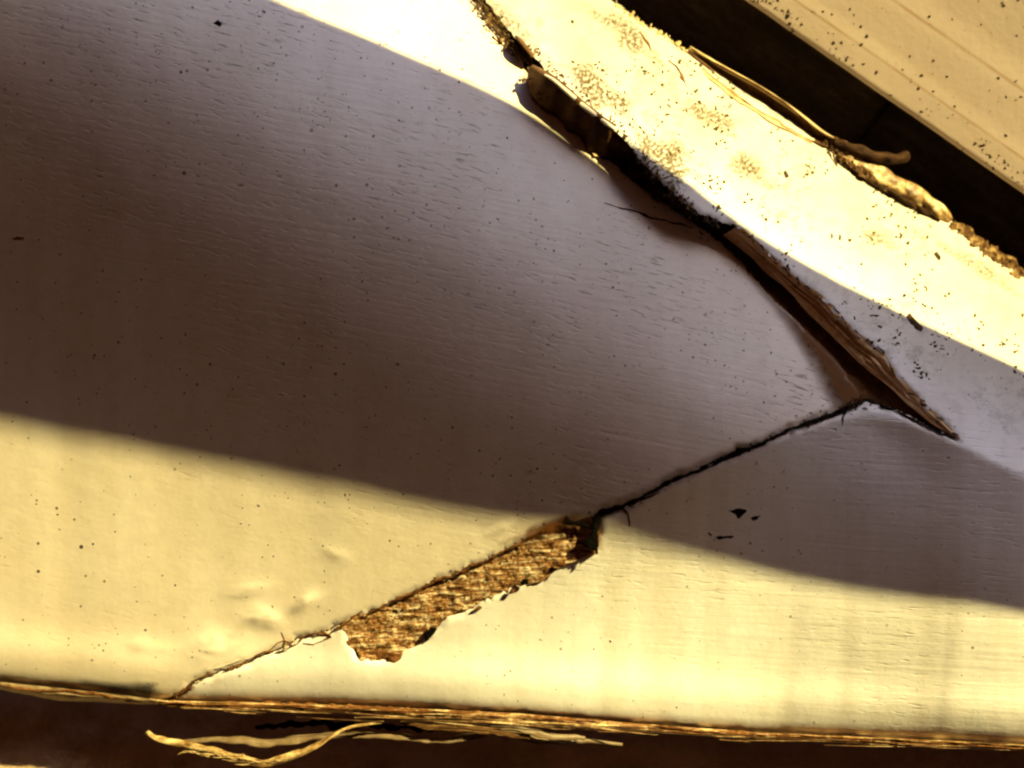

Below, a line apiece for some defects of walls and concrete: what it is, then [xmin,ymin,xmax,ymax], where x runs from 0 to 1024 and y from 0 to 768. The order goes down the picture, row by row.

crack [468,0,960,526]
peeling [614,1,1024,279]
crack [165,611,362,701]
peeling [336,514,602,663]